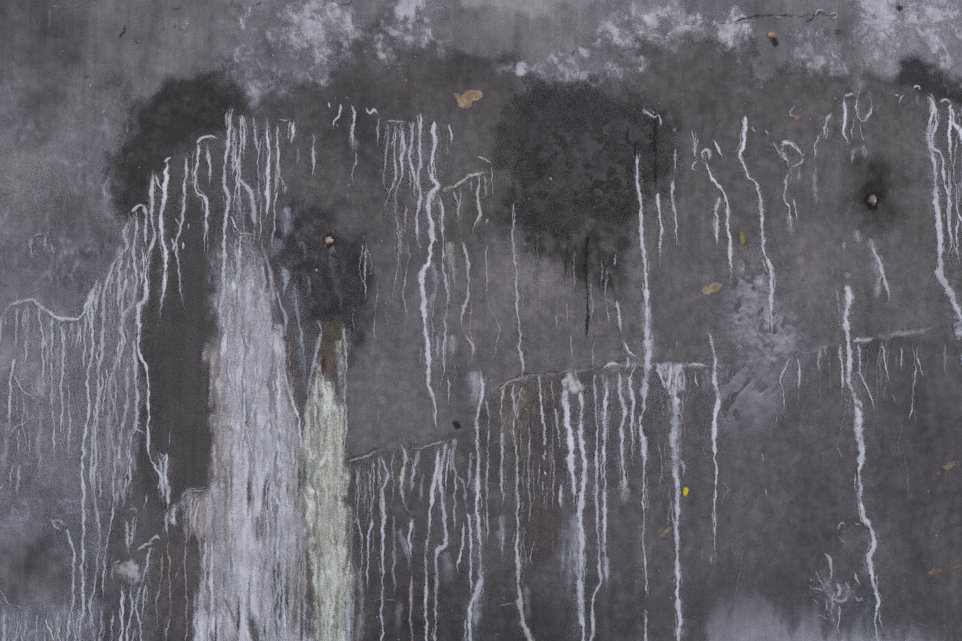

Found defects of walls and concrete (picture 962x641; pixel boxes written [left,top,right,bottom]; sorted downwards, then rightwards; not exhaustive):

damp [233,3,256,31]
crack [724,9,837,24]
damp [245,79,263,103]
damp [29,231,79,283]
damp [0,281,105,641]